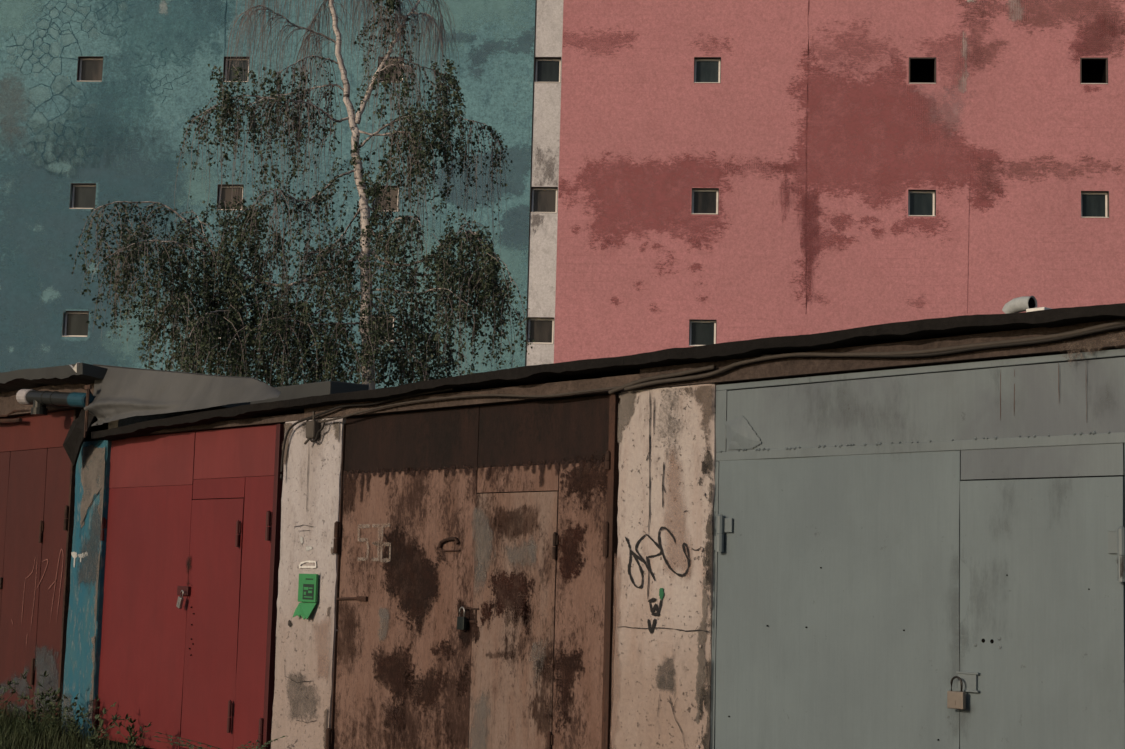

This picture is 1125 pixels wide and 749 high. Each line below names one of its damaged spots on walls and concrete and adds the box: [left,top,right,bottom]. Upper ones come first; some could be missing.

crack [6,0,192,176]
peeling [957,0,1125,69]
damp [781,177,819,298]
flaking render [77,445,105,721]
corrosion [336,518,585,749]
corrosion [490,505,543,539]
corrosion [553,449,619,586]